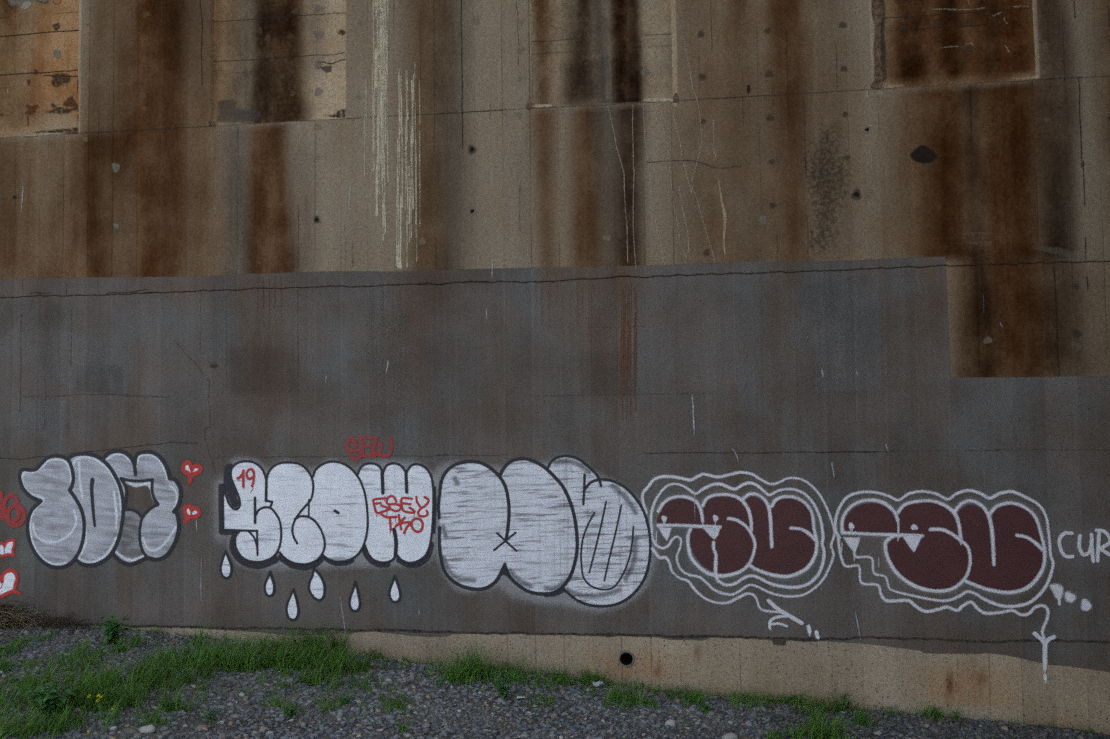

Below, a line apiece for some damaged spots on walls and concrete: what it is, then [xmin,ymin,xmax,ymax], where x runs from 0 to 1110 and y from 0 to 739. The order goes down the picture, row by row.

corrosion [619,107,640,266]